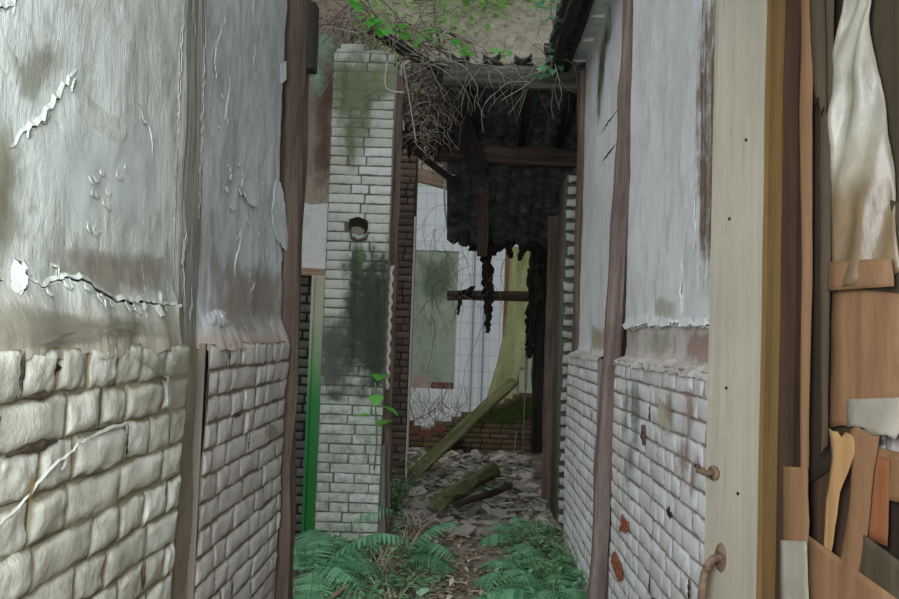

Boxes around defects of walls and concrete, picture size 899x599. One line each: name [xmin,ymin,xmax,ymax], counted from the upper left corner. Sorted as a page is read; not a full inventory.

peeling [10,68,78,149]
peeling [79,130,150,211]
flaking render [226,173,288,251]
spalling [10,255,34,297]
spalling [63,278,168,316]
damp [321,247,388,401]
flaking render [622,315,709,331]
crack [0,421,129,525]